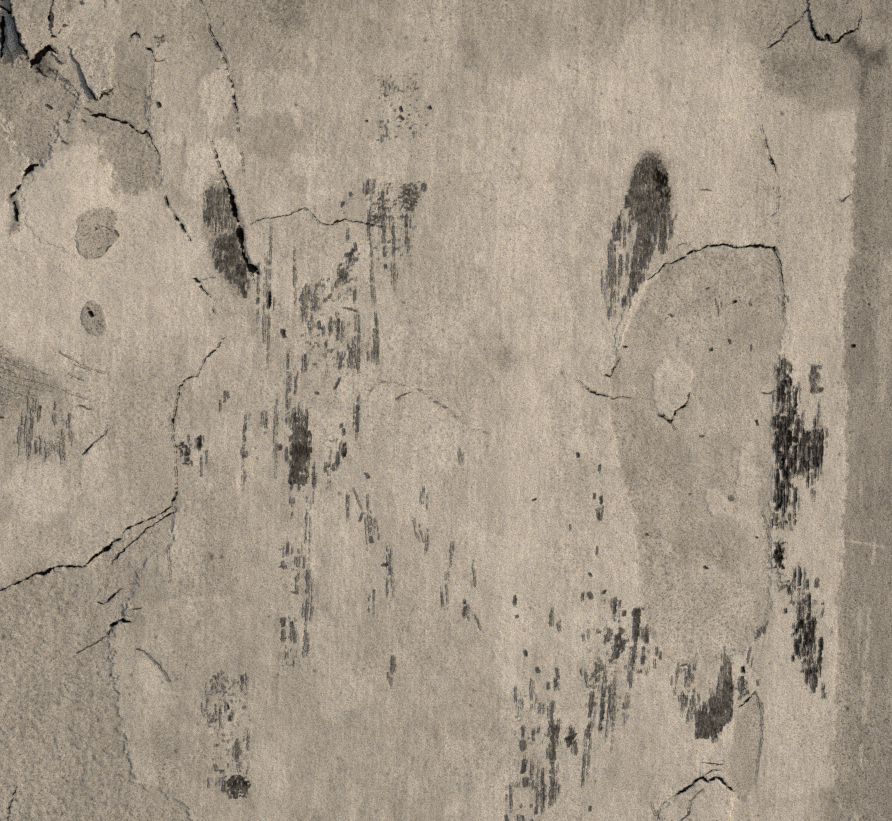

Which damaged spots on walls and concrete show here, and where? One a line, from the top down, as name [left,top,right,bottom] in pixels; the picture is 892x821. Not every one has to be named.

spalling [0,0,164,196]
crack [201,0,384,281]
crack [768,9,862,48]
water stain [602,159,674,309]
crack [648,243,786,316]
crack [0,337,225,591]
water stain [262,179,418,667]
water stain [773,354,829,524]
crack [78,588,142,653]
water stain [575,613,650,788]
water stain [672,644,759,743]
crack [653,762,735,821]